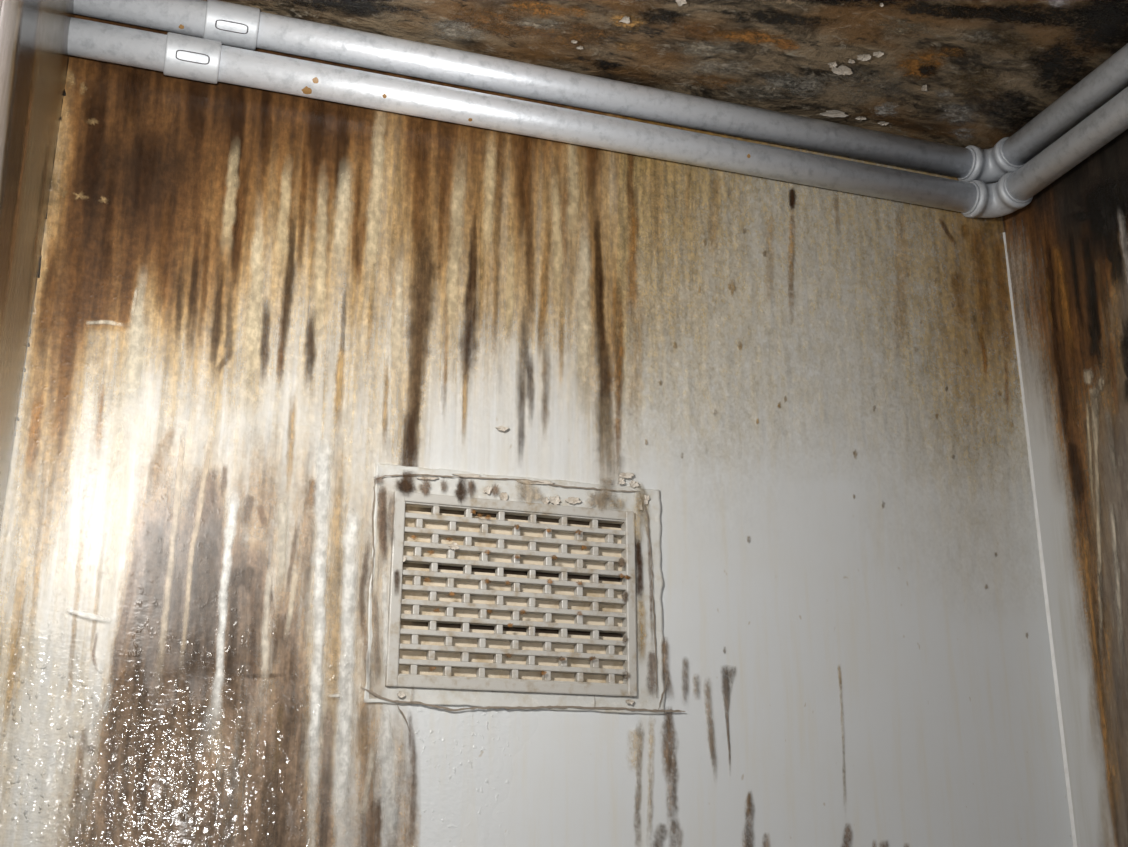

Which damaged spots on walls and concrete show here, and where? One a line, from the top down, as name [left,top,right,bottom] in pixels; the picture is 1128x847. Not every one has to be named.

corrosion [75,14,201,38]
corrosion [452,2,605,48]
corrosion [222,44,962,181]
damp [817,0,1128,96]
damp [1075,176,1128,281]
corrosion [5,56,821,709]
corrosion [814,129,1128,813]
damp [1084,324,1122,643]
damp [68,434,415,847]
damp [618,472,733,764]
damp [633,712,680,847]
damp [744,794,769,847]